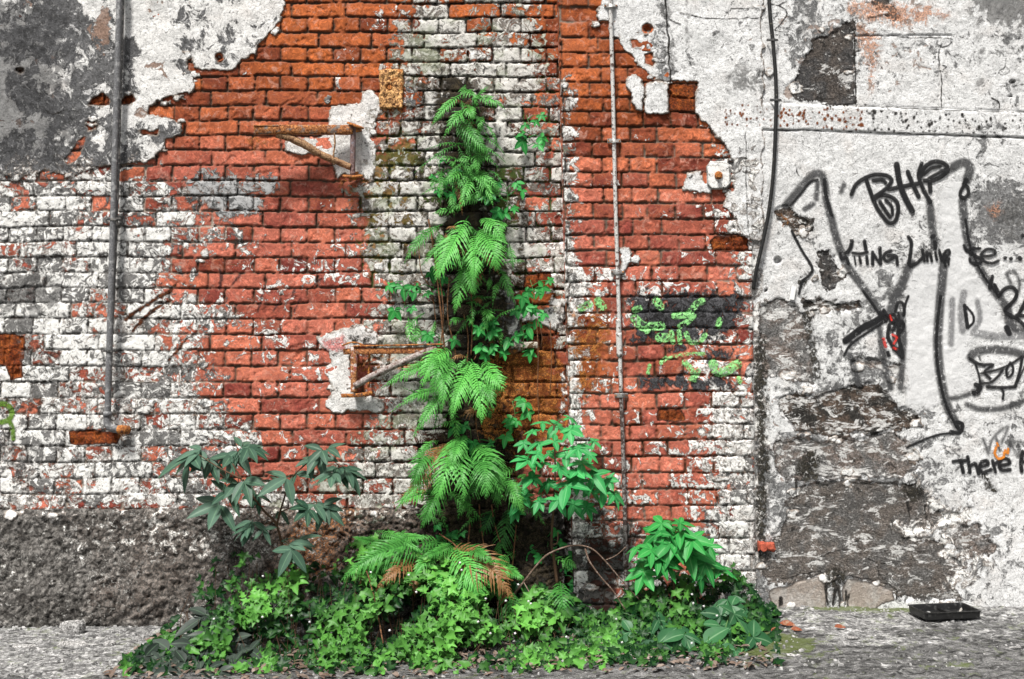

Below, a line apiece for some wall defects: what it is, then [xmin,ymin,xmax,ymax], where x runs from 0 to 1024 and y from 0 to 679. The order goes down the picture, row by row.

peeling [0,0,598,523]
peeling [560,498,599,610]
flaking render [591,0,997,608]